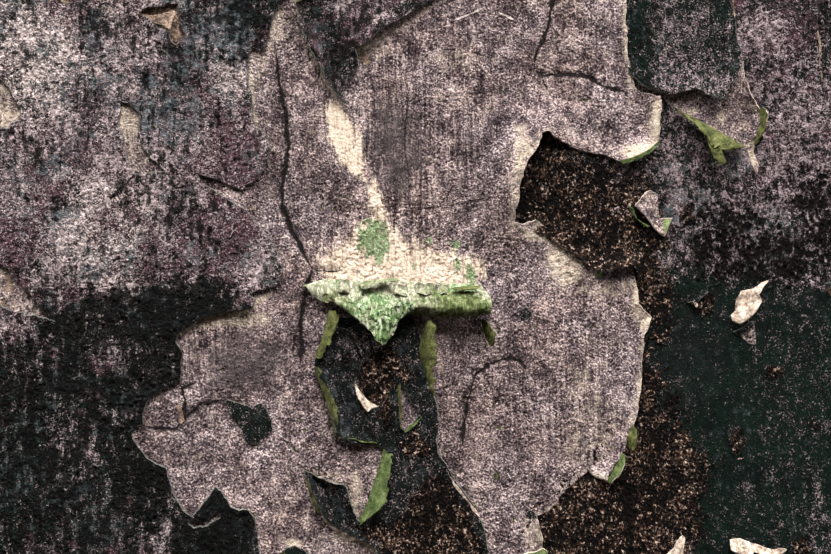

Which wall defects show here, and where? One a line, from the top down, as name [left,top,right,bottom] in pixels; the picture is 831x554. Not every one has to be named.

peeling [0,0,283,554]
flaking render [132,0,769,554]
crack [533,0,629,93]